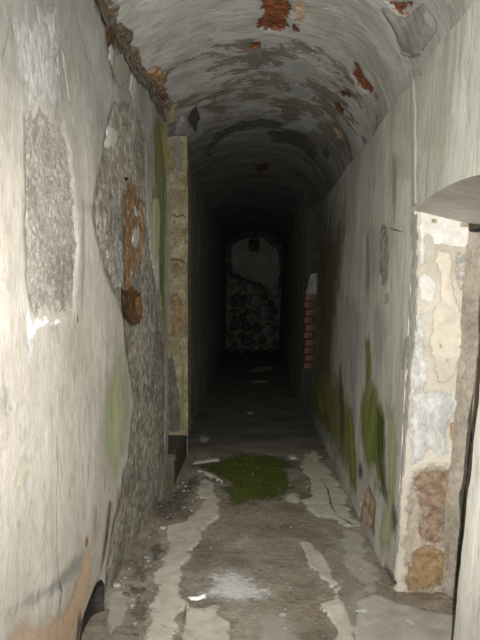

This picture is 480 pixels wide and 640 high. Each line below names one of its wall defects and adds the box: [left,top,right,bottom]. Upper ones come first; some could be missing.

flaking render [12,5,77,316]
flaking render [203,0,378,159]
flaking render [93,0,181,593]
crack [306,476,359,525]
water stain [335,301,382,490]
water stain [376,410,397,530]
flaking render [383,210,469,593]